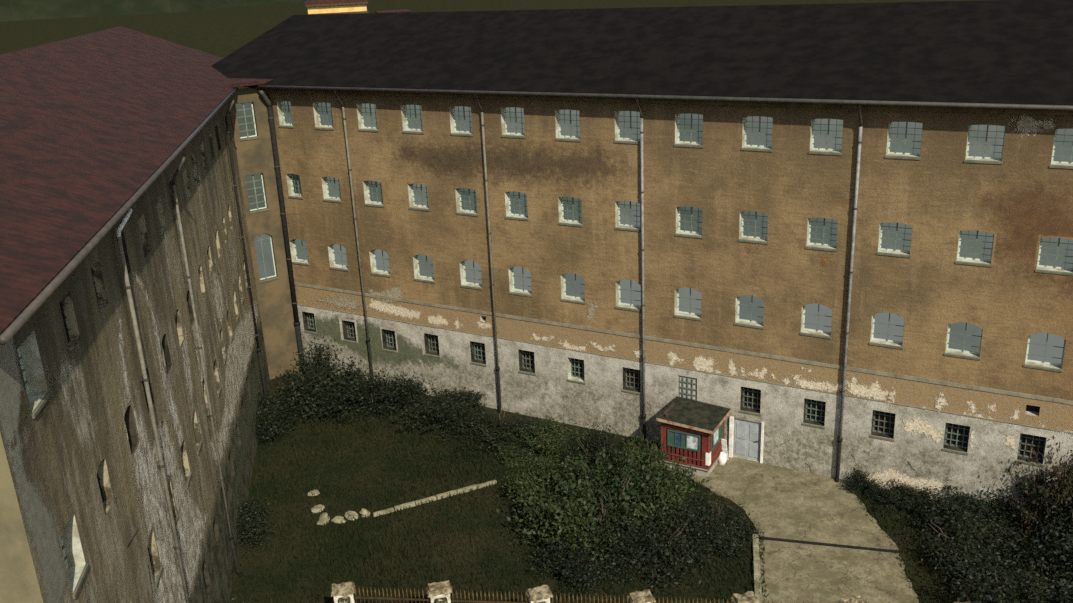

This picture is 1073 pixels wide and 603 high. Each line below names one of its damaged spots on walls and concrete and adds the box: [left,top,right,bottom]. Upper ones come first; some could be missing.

flaking render [1011,114,1056,138]
flaking render [318,286,463,329]
flaking render [531,333,617,352]
damp [210,230,266,510]
flaking render [667,348,896,403]
damp [59,361,96,448]
efflorescence [118,275,207,603]
flaking render [961,401,996,452]
flaking render [1004,410,1024,450]